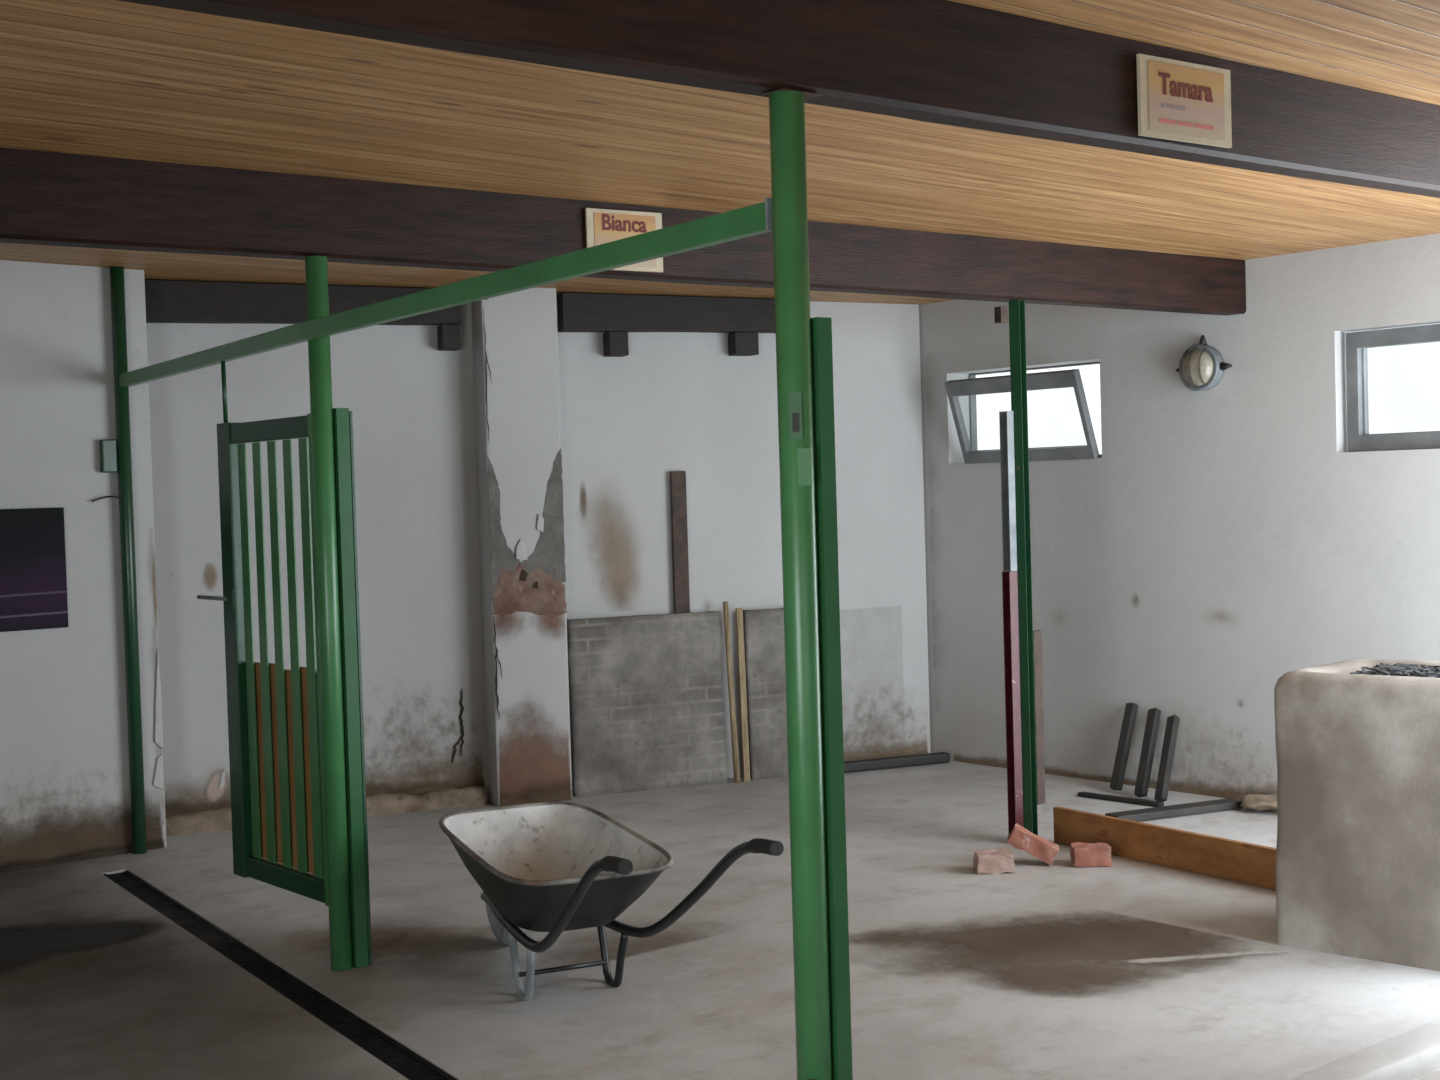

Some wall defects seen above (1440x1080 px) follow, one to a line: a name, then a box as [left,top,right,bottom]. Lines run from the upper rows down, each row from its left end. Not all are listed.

flaking render [488,449,567,631]
leakage [366,720,572,806]
leakage [0,789,231,873]
leakage [853,916,1285,994]